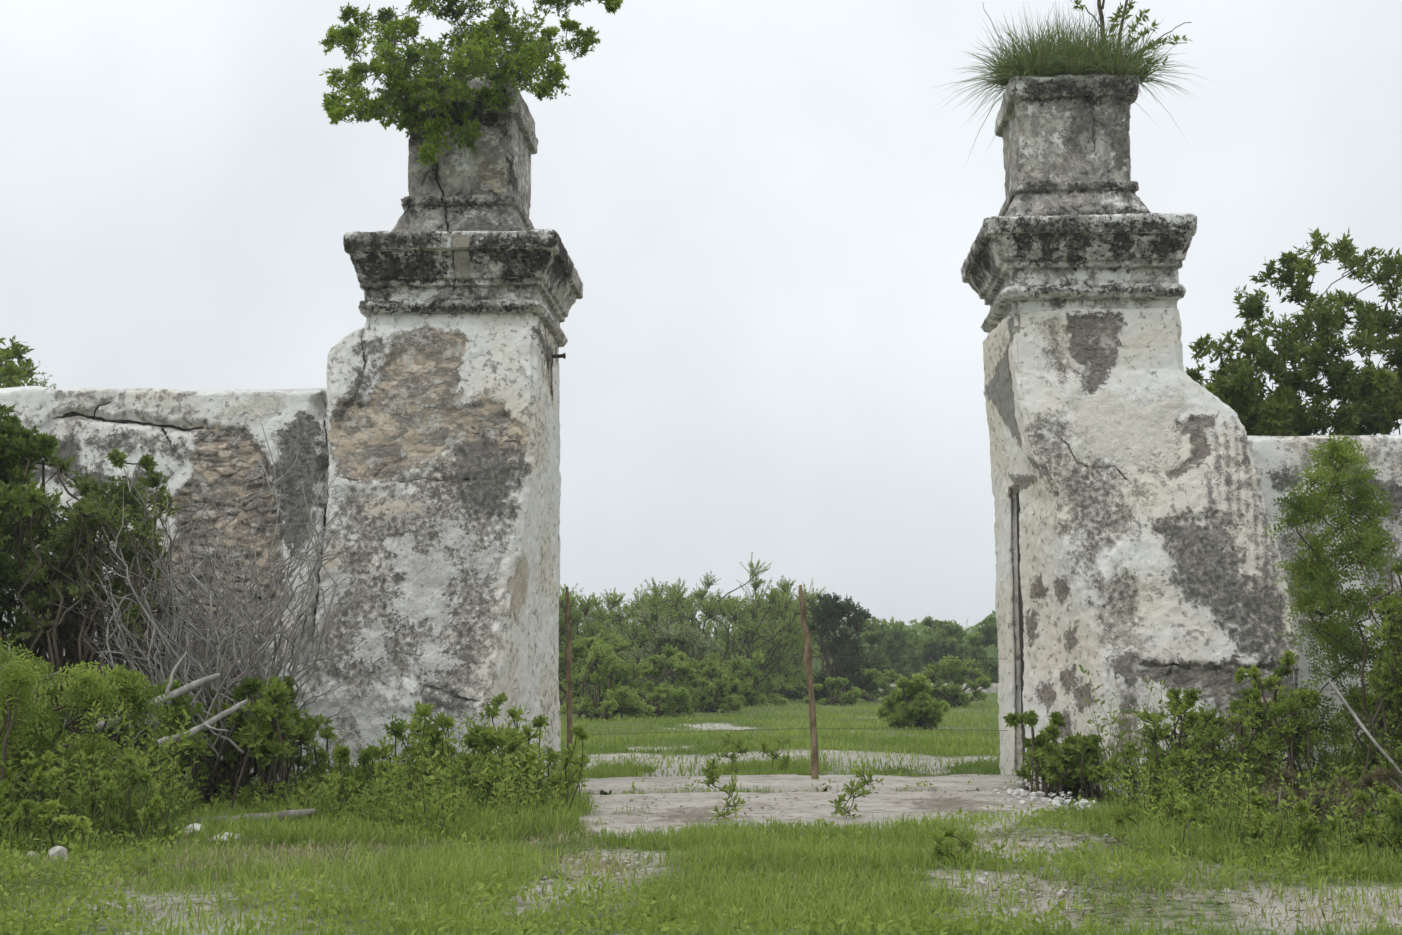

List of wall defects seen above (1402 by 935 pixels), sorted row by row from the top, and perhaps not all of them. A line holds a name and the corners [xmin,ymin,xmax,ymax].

leakage [964,74,1197,307]
crack [52,402,203,450]
flaking render [145,419,287,690]
flaking render [302,322,533,767]
leakage [269,87,574,567]
flaking render [1033,310,1129,395]
leakage [1085,565,1157,662]
leakage [1141,416,1342,663]
leakage [1329,437,1402,622]